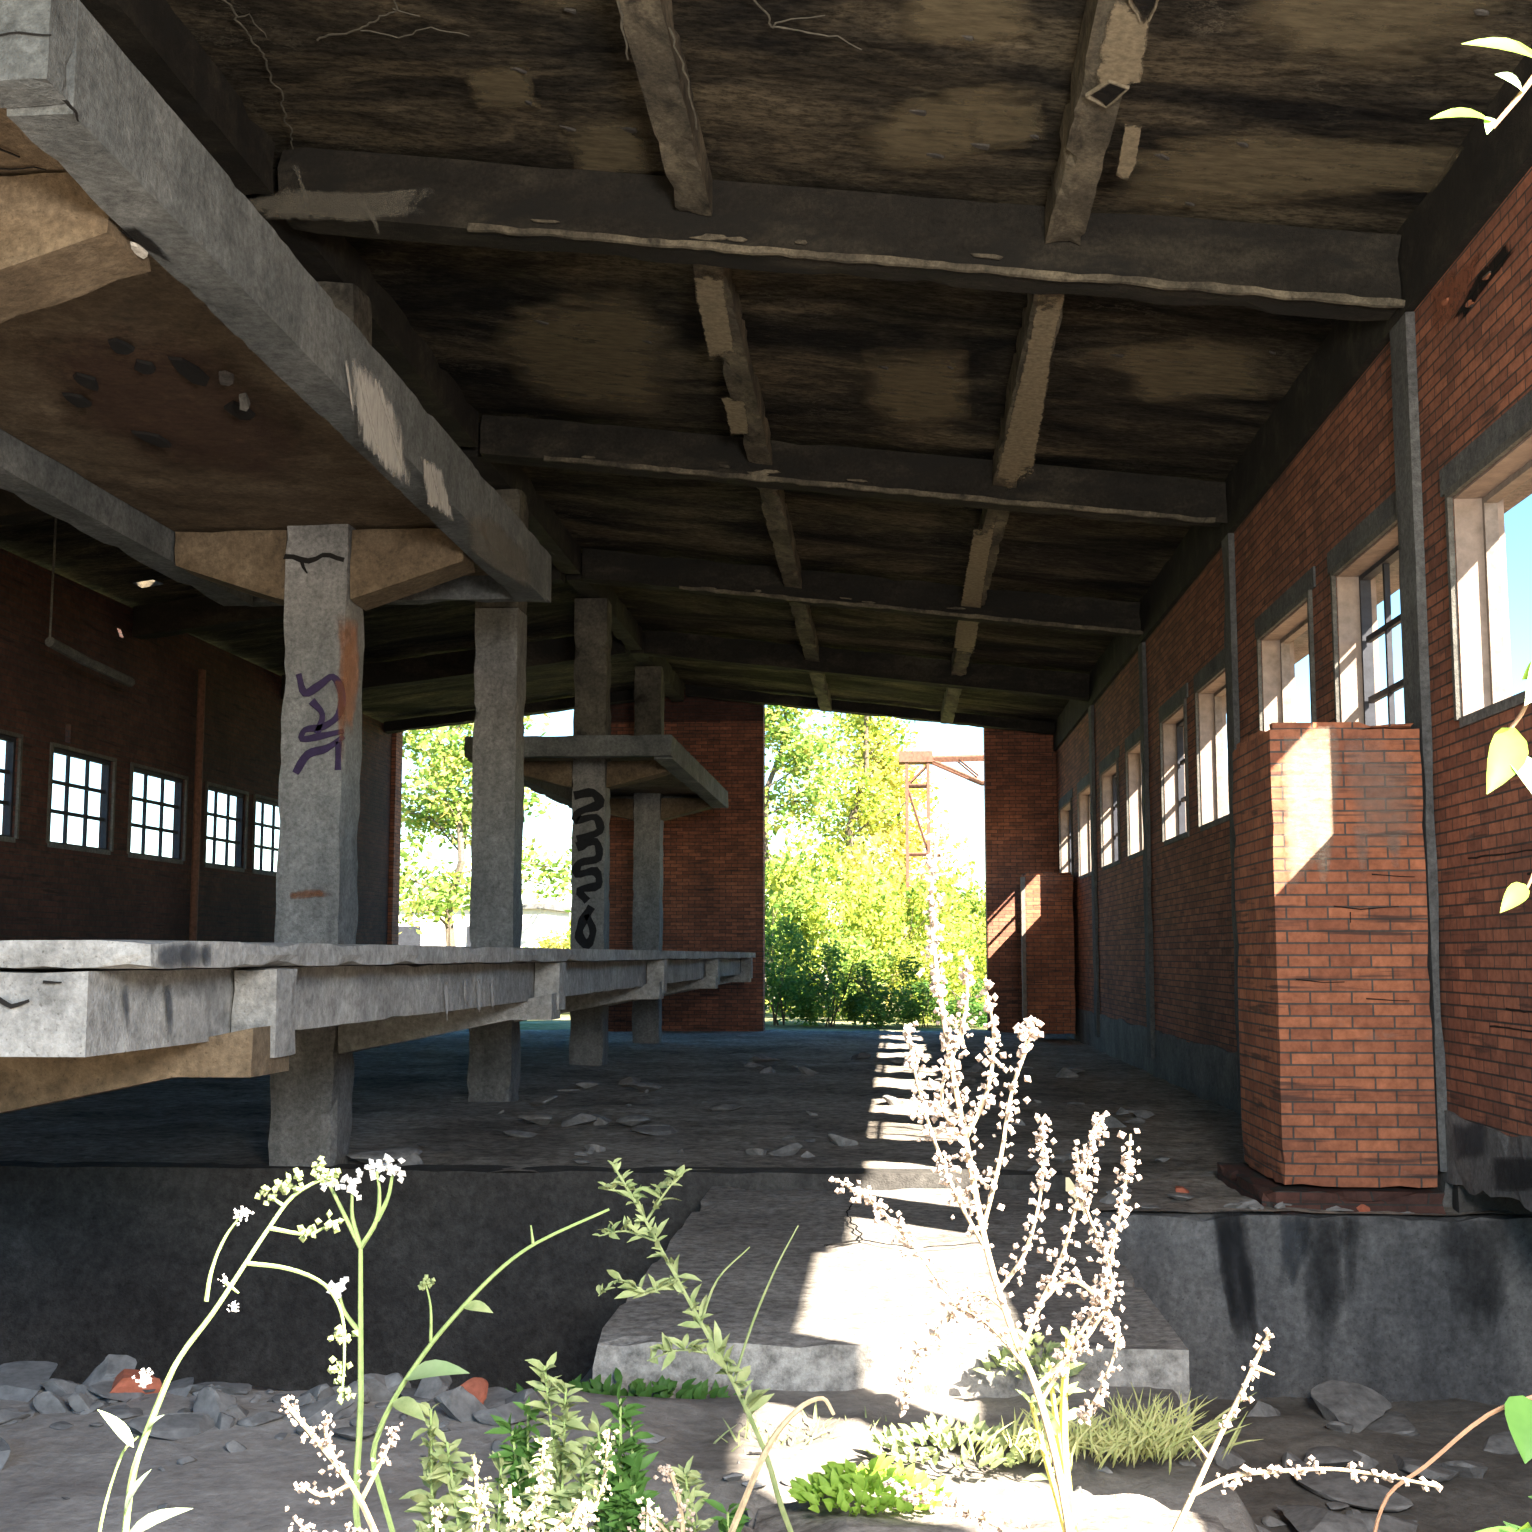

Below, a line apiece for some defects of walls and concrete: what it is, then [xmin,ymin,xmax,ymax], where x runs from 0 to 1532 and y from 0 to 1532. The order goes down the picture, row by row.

crack [0,29,52,37]
crack [753,0,862,50]
peeling [905,0,1039,43]
spalling [1085,0,1159,108]
peeling [866,85,1044,167]
crack [0,148,46,171]
crack [283,553,345,573]
water stain [1219,1215,1253,1327]
water stain [1282,1217,1354,1316]